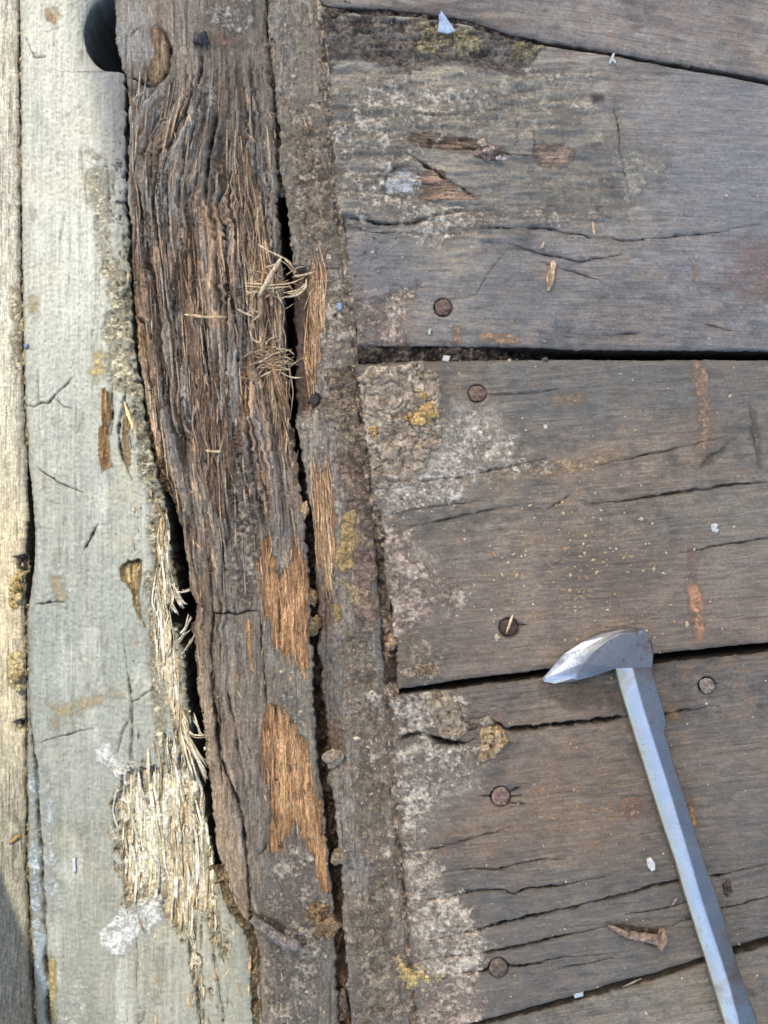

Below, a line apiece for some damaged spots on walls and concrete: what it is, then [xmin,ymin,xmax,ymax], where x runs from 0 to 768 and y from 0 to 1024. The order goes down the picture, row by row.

crack [347,218,422,234]
crack [393,157,750,299]
crack [398,461,535,525]
crack [599,482,763,504]
crack [405,715,627,745]
peeling [108,765,168,910]
peeling [260,690,332,940]
crack [403,787,523,853]
crack [417,859,690,972]
corrosion [613,923,659,946]